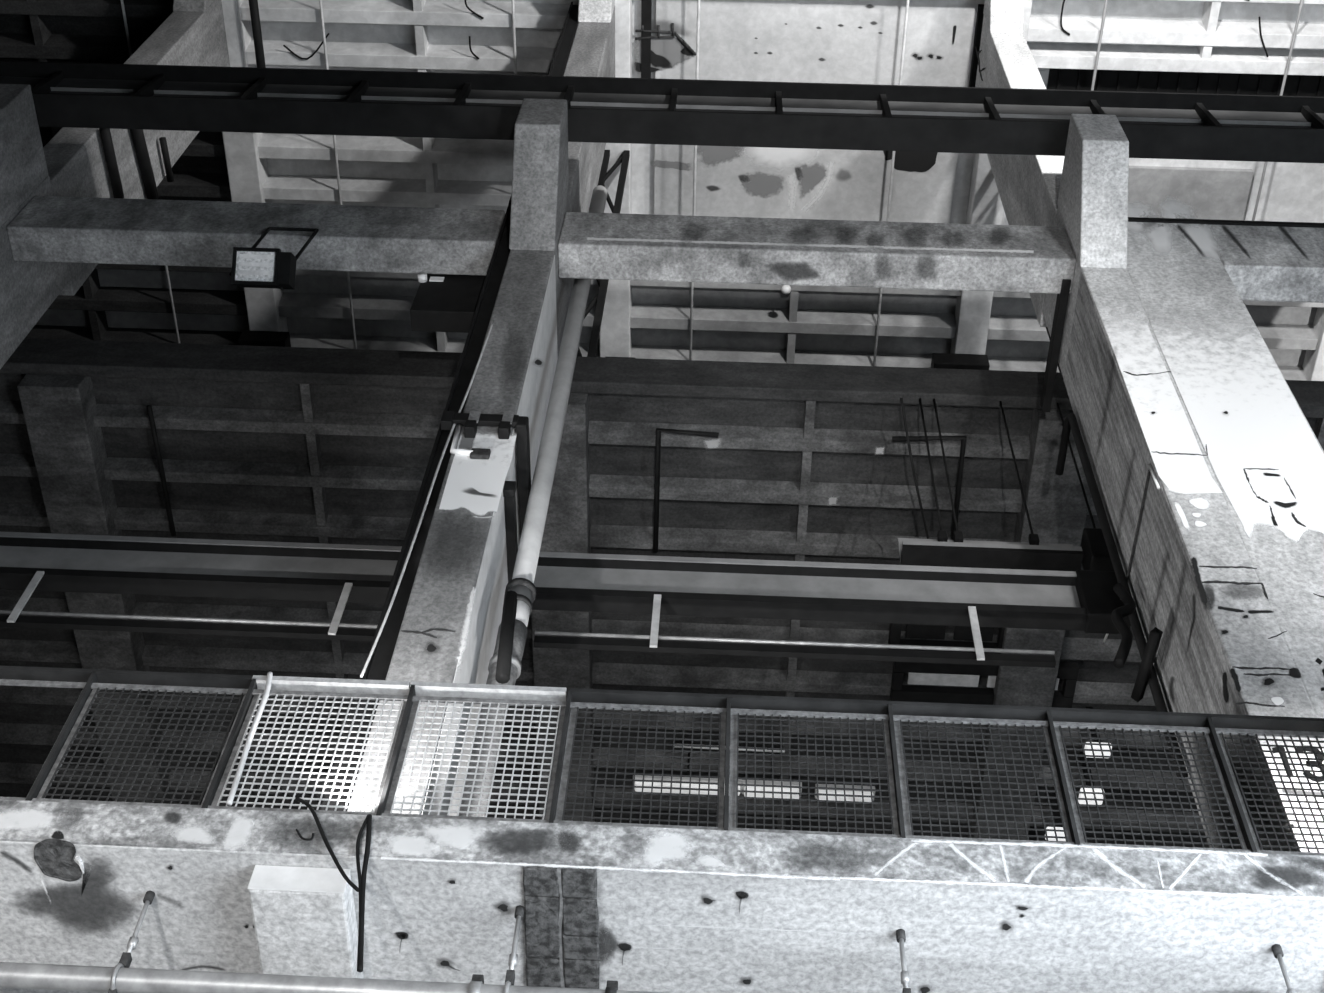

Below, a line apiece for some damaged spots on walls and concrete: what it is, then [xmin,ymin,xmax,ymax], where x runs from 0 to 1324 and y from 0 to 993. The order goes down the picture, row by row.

water stain [587,237,1034,253]
water stain [772,263,816,280]
peeling [1102,317,1324,542]